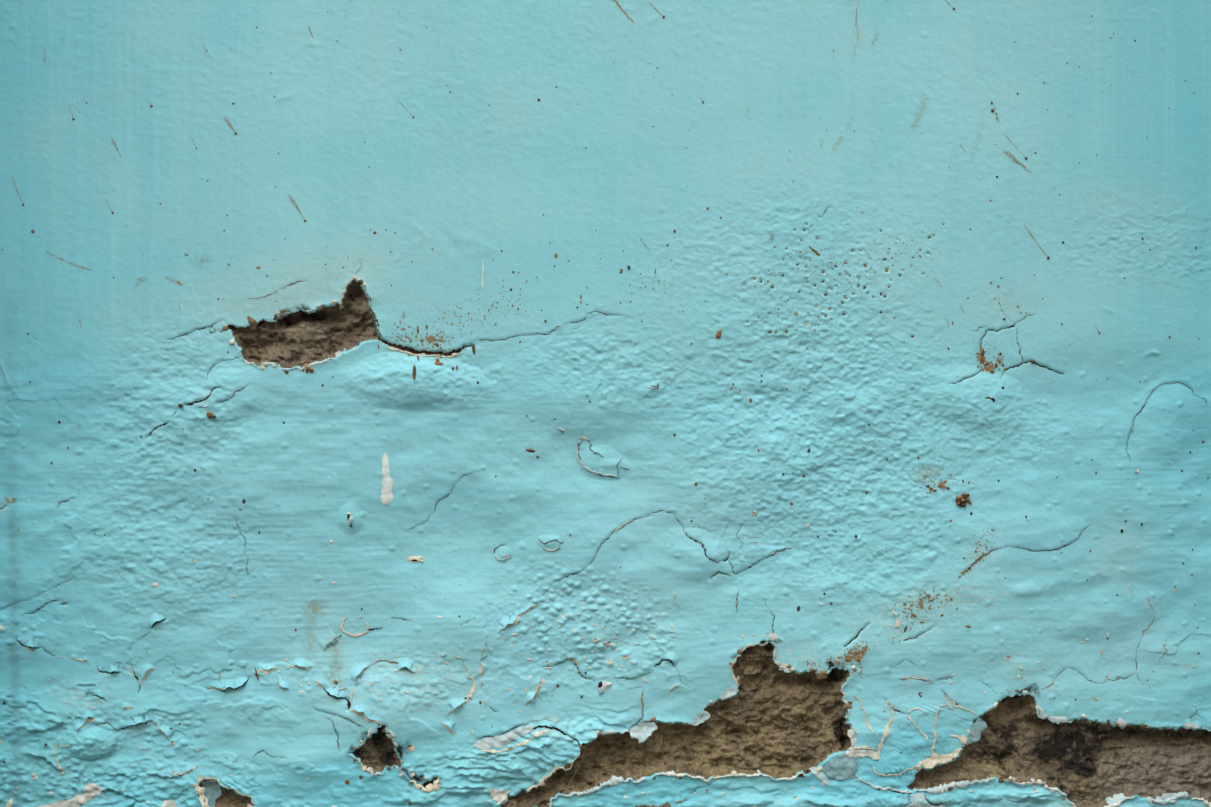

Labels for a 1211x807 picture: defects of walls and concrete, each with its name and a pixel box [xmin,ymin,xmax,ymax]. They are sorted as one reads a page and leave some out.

spalling [222,276,382,373]
crack [378,311,619,358]
crack [952,300,1064,400]
crack [1126,382,1207,458]
crack [207,510,793,751]
spalling [190,773,255,807]
spalling [349,724,440,793]
peeling [471,710,549,753]